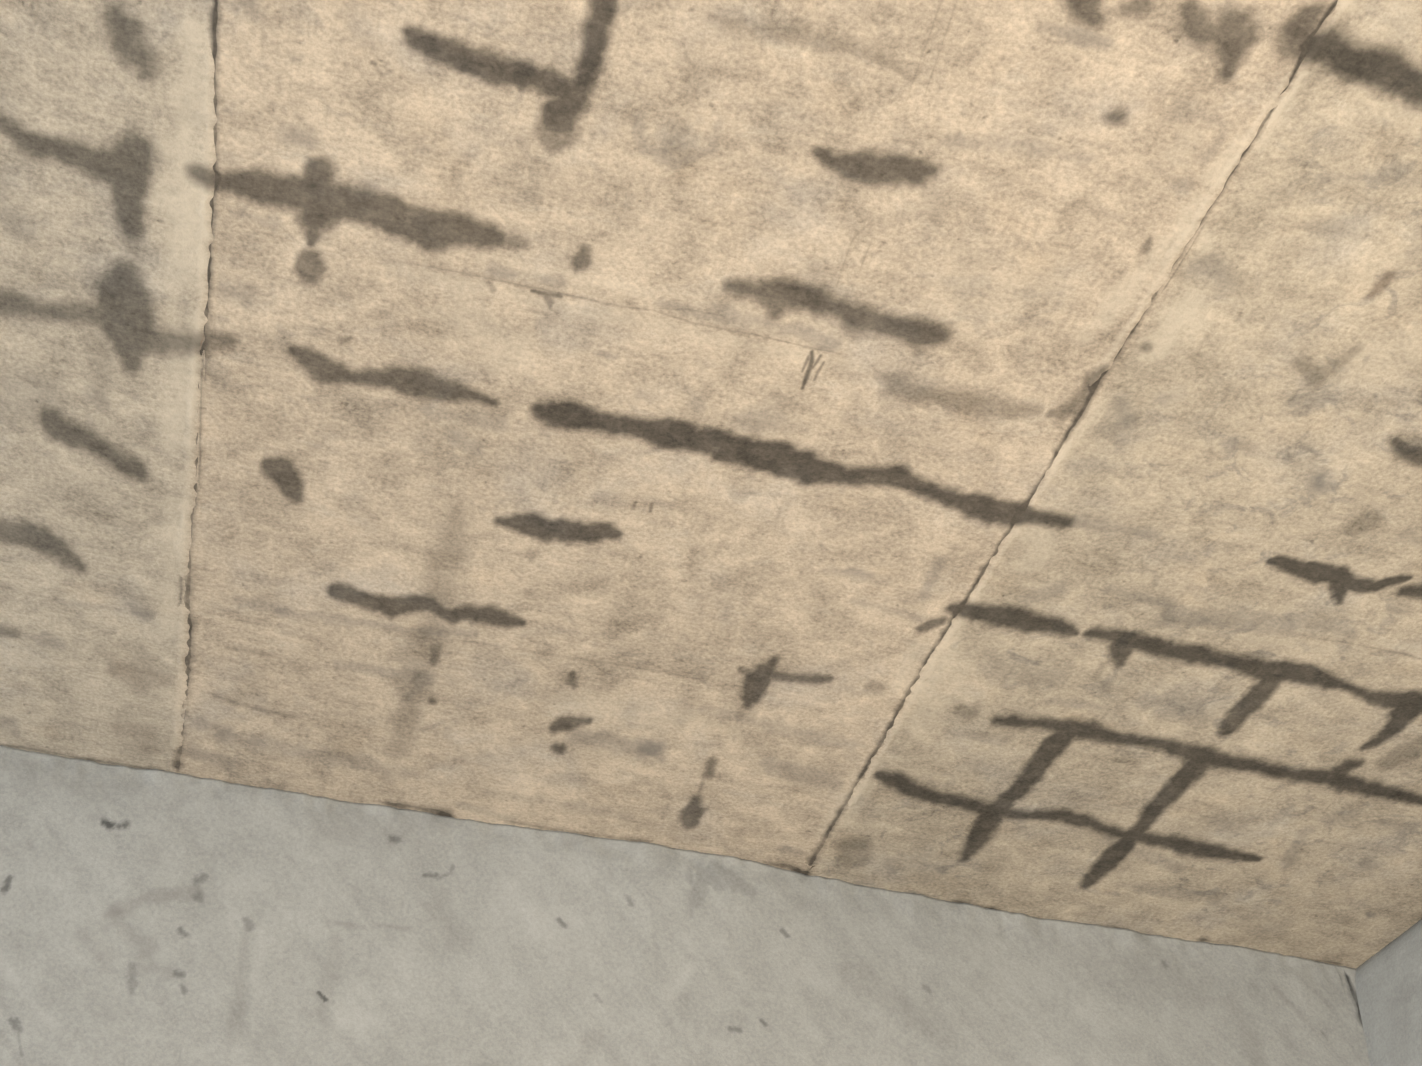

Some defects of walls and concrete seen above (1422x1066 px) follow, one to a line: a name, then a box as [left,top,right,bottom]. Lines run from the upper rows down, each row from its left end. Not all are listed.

damp [396,0,920,159]
damp [1052,0,1422,119]
damp [219,146,536,289]
damp [0,106,200,487]
crack [0,0,305,773]
damp [525,393,1080,533]
crack [759,0,1354,876]
crack [376,797,460,818]
crack [503,820,652,843]
damp [871,597,1422,893]
crack [946,897,1004,911]
crack [1097,921,1135,931]